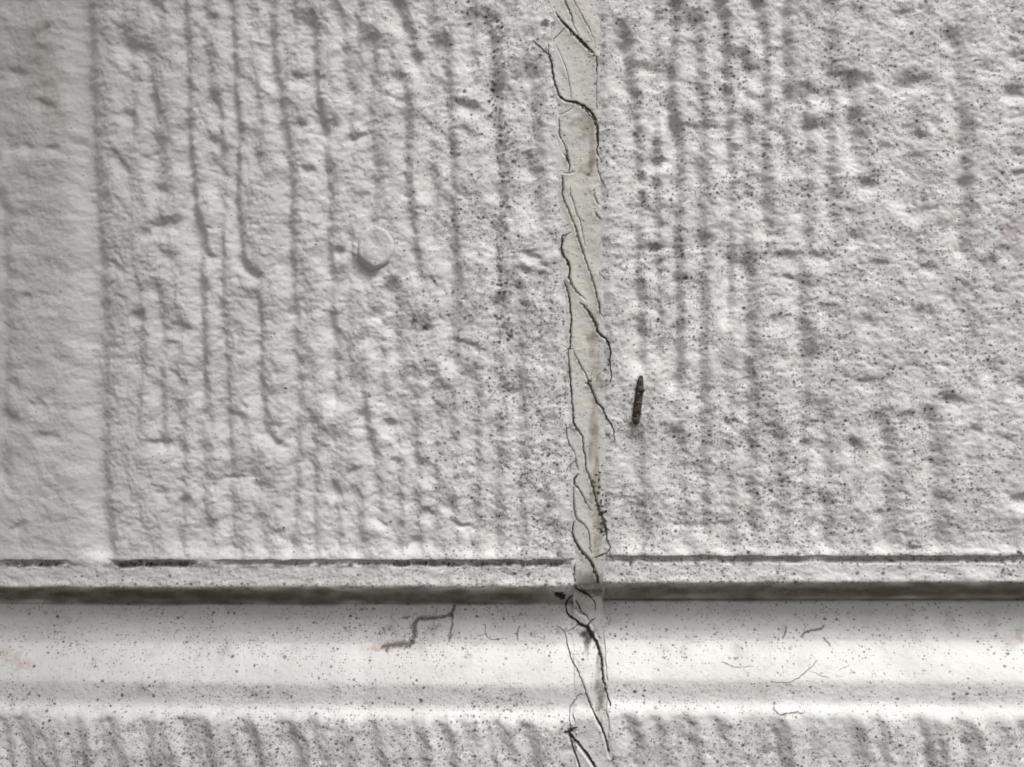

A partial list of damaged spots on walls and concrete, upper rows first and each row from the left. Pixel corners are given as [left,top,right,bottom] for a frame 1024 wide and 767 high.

crack [382,605,455,651]
crack [533,0,615,767]